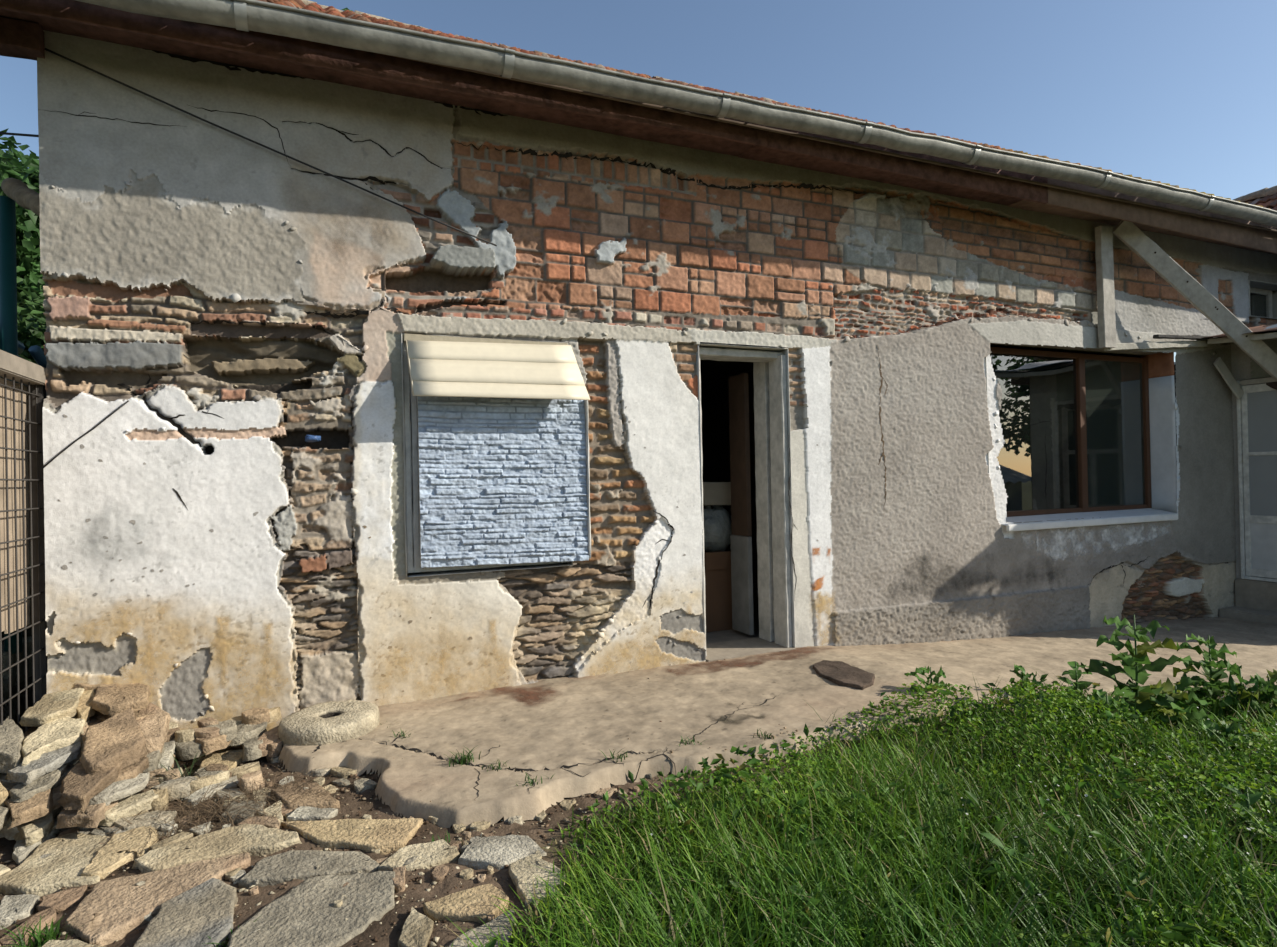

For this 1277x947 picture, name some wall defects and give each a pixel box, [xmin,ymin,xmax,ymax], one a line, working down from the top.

crack [46,105,861,194]
spalling [1113,246,1224,355]
crack [117,374,222,447]
spalling [39,169,378,710]
spalling [367,138,1098,682]
crack [877,306,1080,505]
crack [642,511,674,613]
spalling [1121,549,1213,624]
damp [101,642,180,703]
peeling [159,647,215,723]
damp [203,618,288,731]
crack [355,697,775,798]